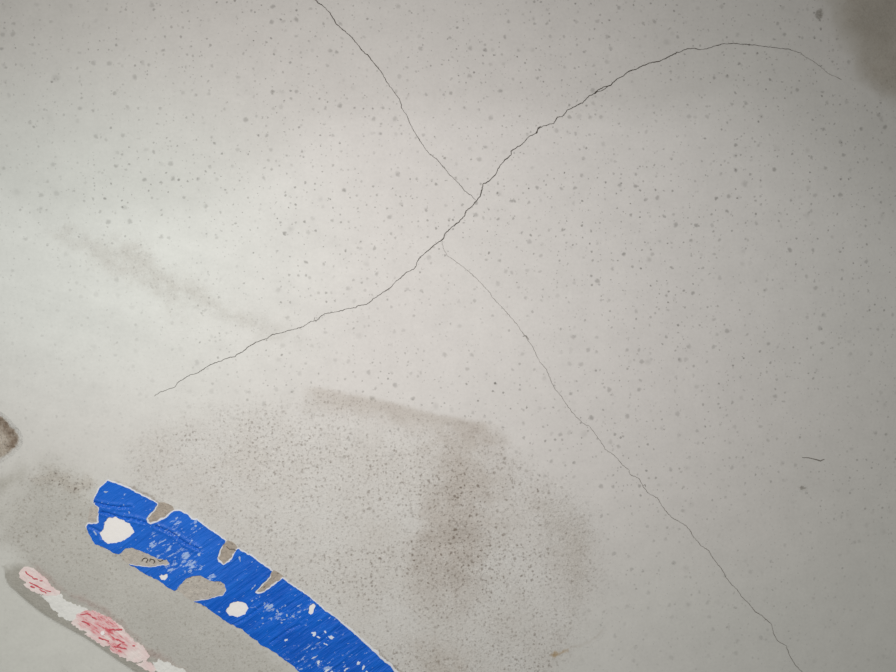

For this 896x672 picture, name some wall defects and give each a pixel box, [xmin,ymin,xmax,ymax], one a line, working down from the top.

damp [804,0,896,123]
crack [156,0,840,670]
peeling [148,502,174,523]
peeling [88,506,169,580]
peeling [218,540,237,564]
peeling [176,576,226,601]
peeling [257,570,283,592]
peeling [19,566,186,672]
peeling [226,601,248,617]